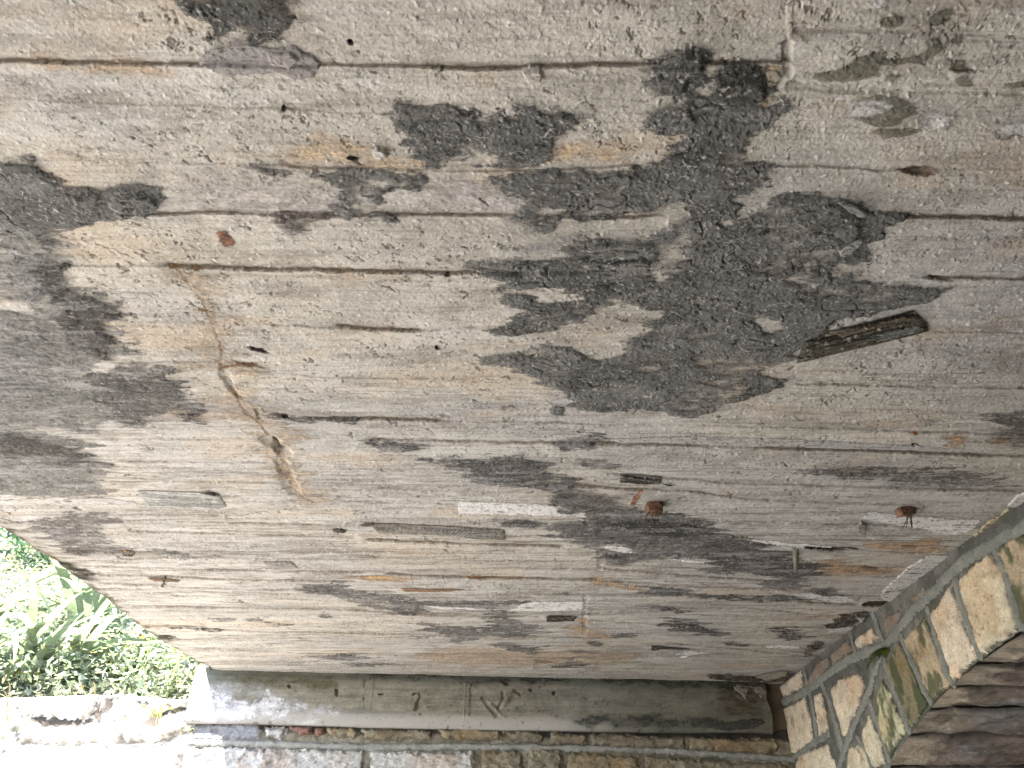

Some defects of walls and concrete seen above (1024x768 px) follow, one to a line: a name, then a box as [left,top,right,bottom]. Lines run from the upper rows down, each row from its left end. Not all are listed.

leakage [642,108,695,137]
leakage [835,94,955,138]
leakage [183,176,341,218]
rust [216,231,234,247]
leakage [6,240,122,361]
leakage [0,344,61,399]
crack [169,264,313,502]
leakage [0,435,114,469]
leakage [490,519,545,530]
leakage [554,494,712,539]